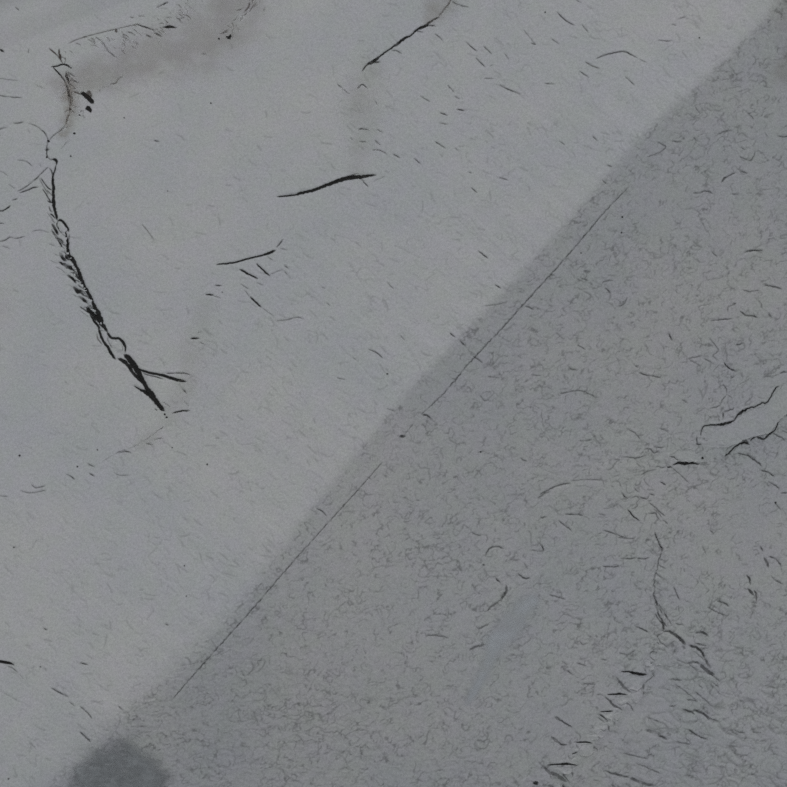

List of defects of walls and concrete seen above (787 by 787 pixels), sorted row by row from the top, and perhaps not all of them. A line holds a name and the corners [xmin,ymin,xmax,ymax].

crack [360,2,450,86]
crack [50,49,94,134]
crack [278,174,375,197]
crack [0,131,188,418]
crack [217,241,282,278]
crack [668,382,787,476]
crack [533,659,661,787]